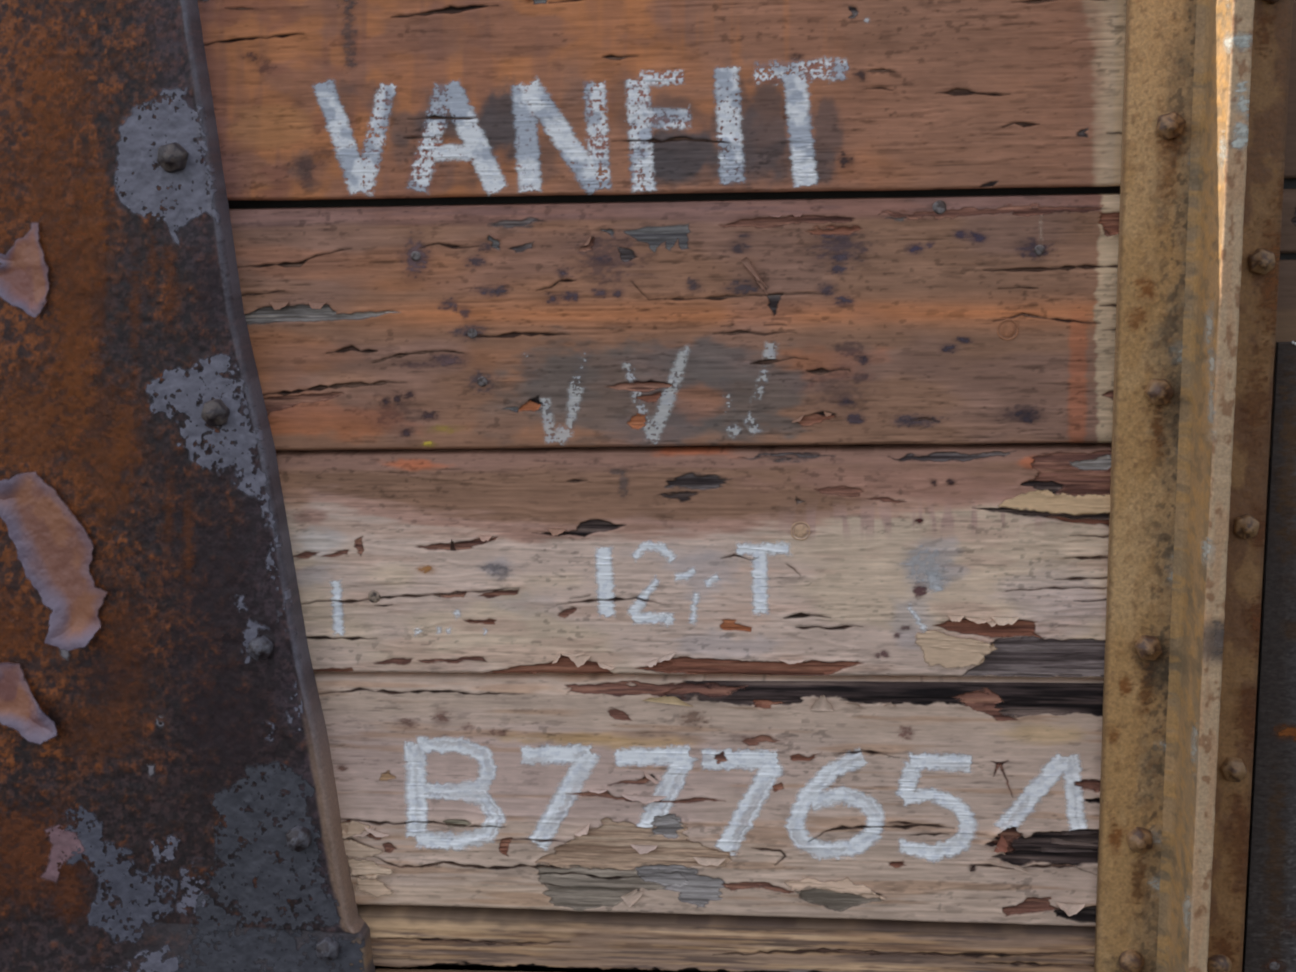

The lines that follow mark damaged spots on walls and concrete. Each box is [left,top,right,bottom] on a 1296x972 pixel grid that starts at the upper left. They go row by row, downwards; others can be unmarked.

peeling [115,88,220,245]
peeling [893,451,1014,462]
peeling [146,354,364,664]
peeling [978,450,1111,526]
peeling [1074,779,1100,803]
peeling [443,819,471,827]
peeling [41,762,365,972]
peeling [341,820,396,897]
peeling [499,838,511,856]
peeling [986,827,1099,873]
peeling [1003,897,1096,923]